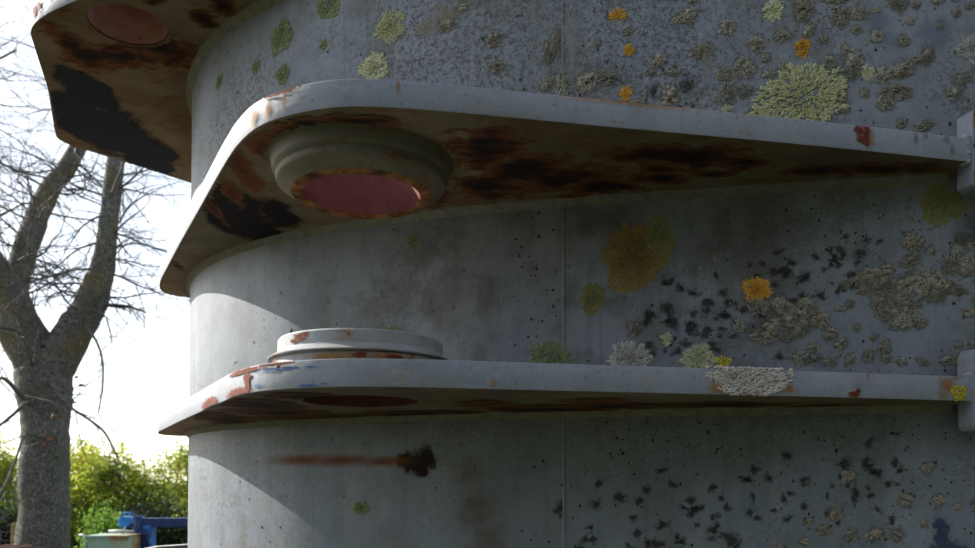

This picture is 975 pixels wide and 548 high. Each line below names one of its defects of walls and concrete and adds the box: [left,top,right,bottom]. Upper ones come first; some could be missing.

rust [188,0,238,29]
rust [32,0,198,77]
rust [218,85,401,206]
rust [425,125,952,209]
rust [204,197,230,227]
rust [290,331,309,343]
rust [312,351,415,359]
rust [193,359,862,424]
rust [283,446,436,477]